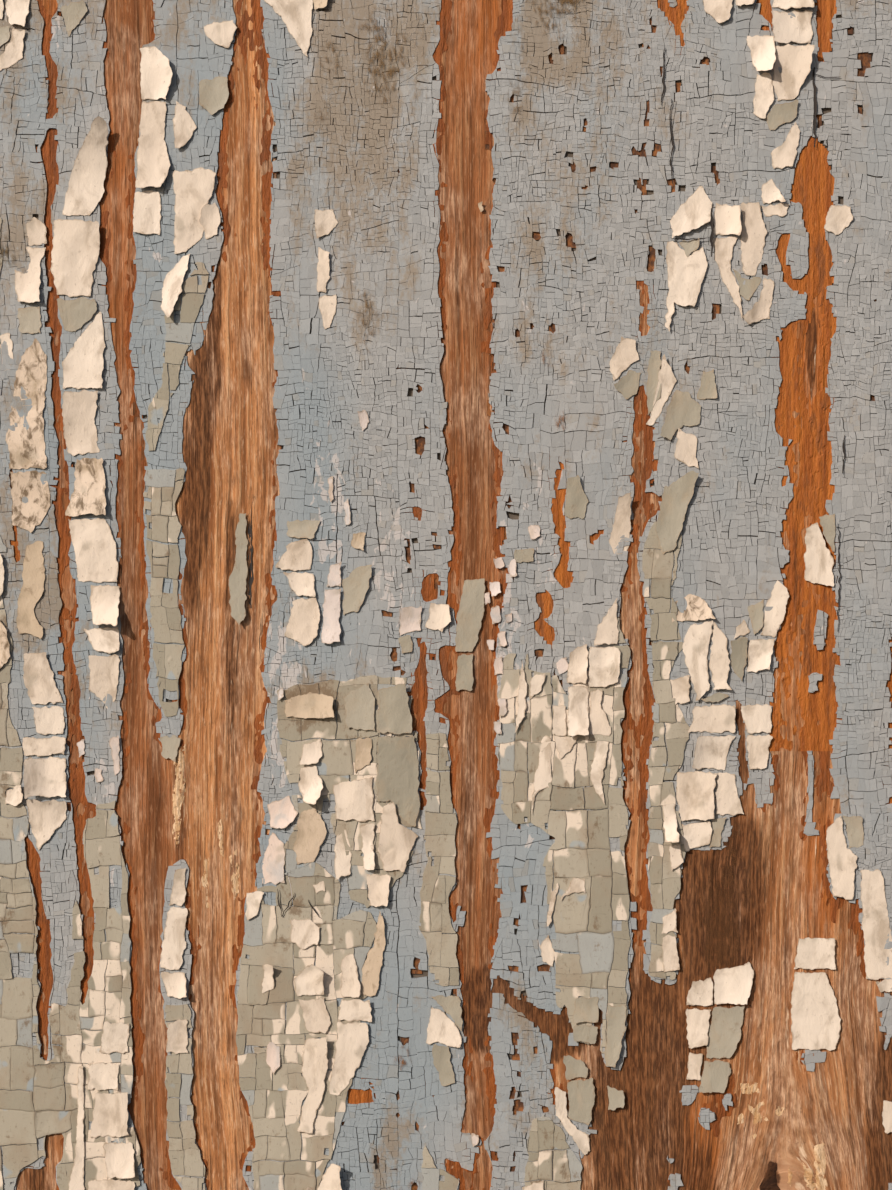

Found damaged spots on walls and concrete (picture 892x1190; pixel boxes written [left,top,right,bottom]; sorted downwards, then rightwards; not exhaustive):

peeling [703,0,837,130]
peeling [173,101,197,148]
crack [661,48,674,189]
crack [812,67,837,147]
crack [672,208,714,257]
peeling [634,279,656,339]
peeling [610,336,639,380]
spalling [413,424,434,460]
crack [839,435,847,473]
crack [248,495,263,661]
crack [835,527,843,627]
spalling [509,1032,526,1115]